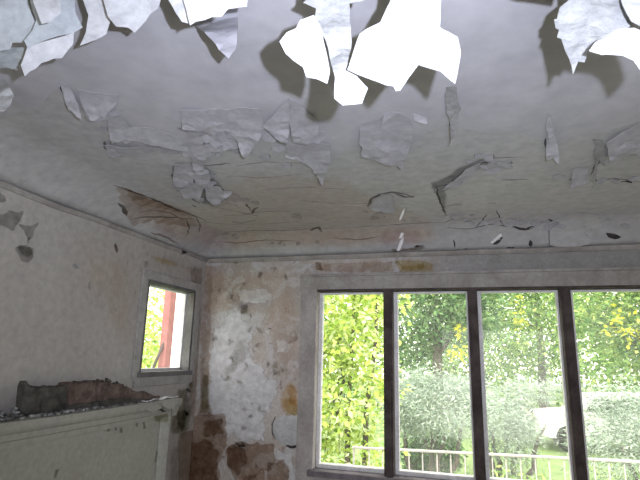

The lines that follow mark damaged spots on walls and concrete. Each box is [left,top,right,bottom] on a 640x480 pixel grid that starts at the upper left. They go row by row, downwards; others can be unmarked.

peeling [0,0,640,220]
crack [230,204,553,232]
peeling [238,288,273,304]
peeling [204,311,279,445]
peeling [276,450,295,480]